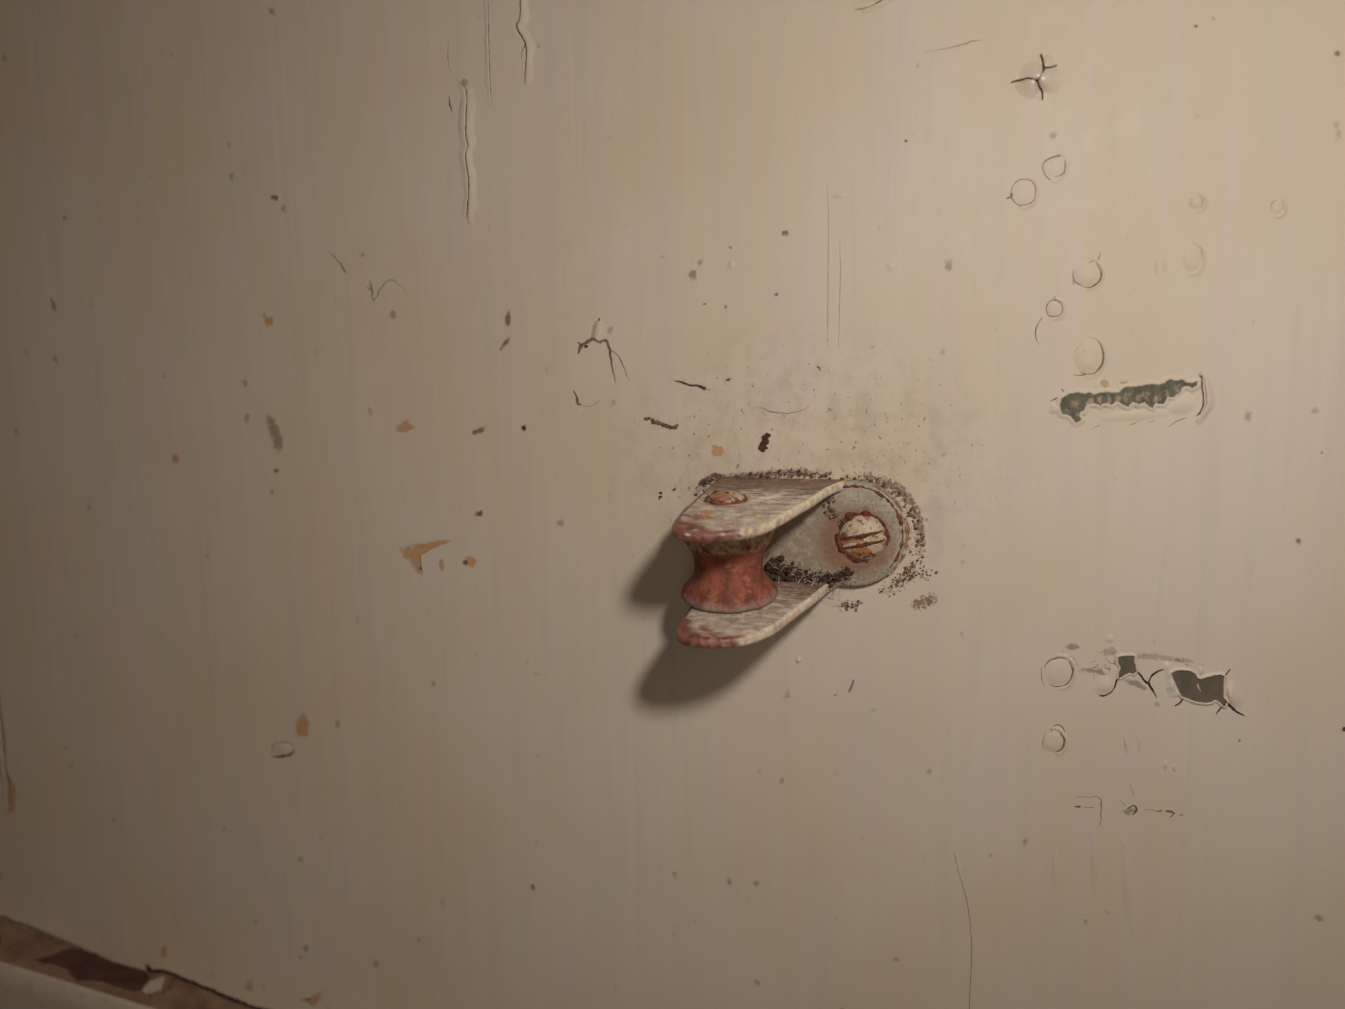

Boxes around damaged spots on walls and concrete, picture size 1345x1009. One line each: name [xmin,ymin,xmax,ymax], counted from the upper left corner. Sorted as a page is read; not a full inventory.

crack [1011,54,1064,100]
peeling [1048,368,1216,429]
corrosion [699,473,748,506]
corrosion [835,510,890,563]
peeling [1090,633,1245,716]
peeling [32,948,174,997]